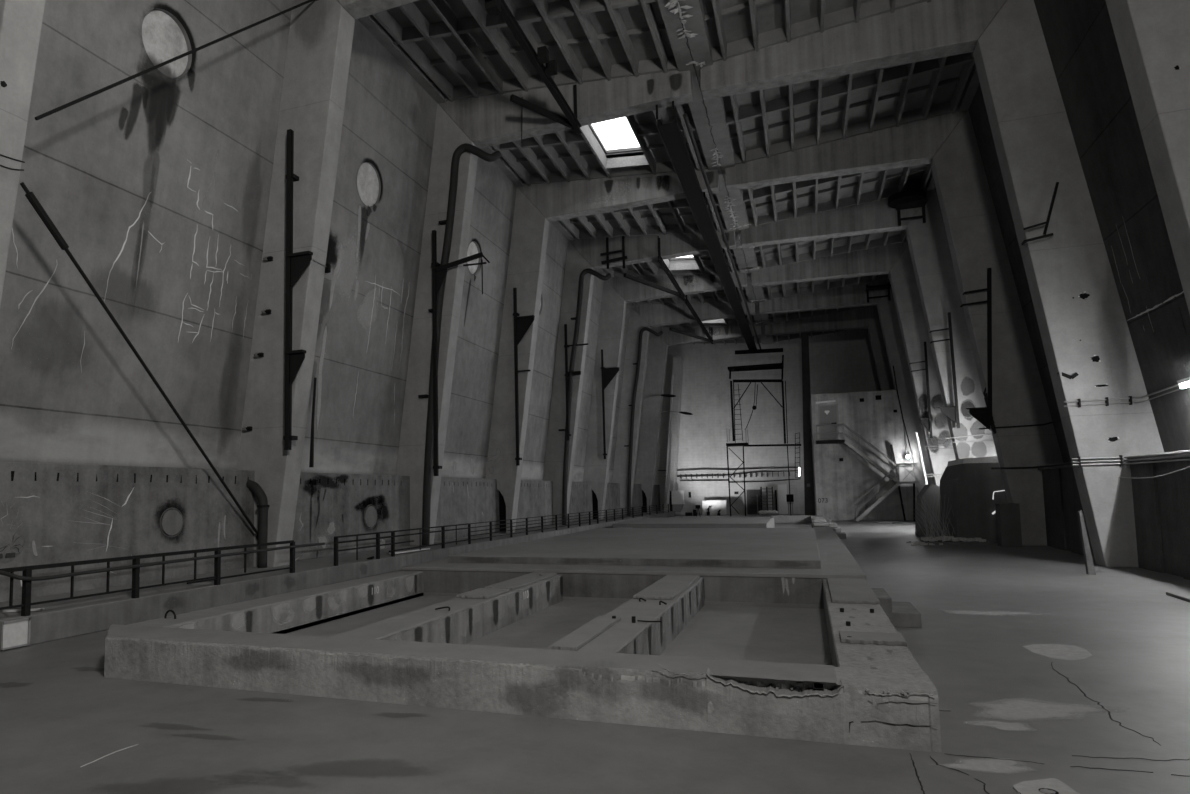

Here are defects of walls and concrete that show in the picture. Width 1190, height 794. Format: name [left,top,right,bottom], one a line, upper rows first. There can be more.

water stain [119,4,196,151]
crack [104,192,164,301]
crack [178,161,252,342]
water stain [329,159,383,311]
water stain [317,327,327,429]
water stain [305,475,348,557]
spalling [706,672,843,698]
crack [930,663,1190,794]